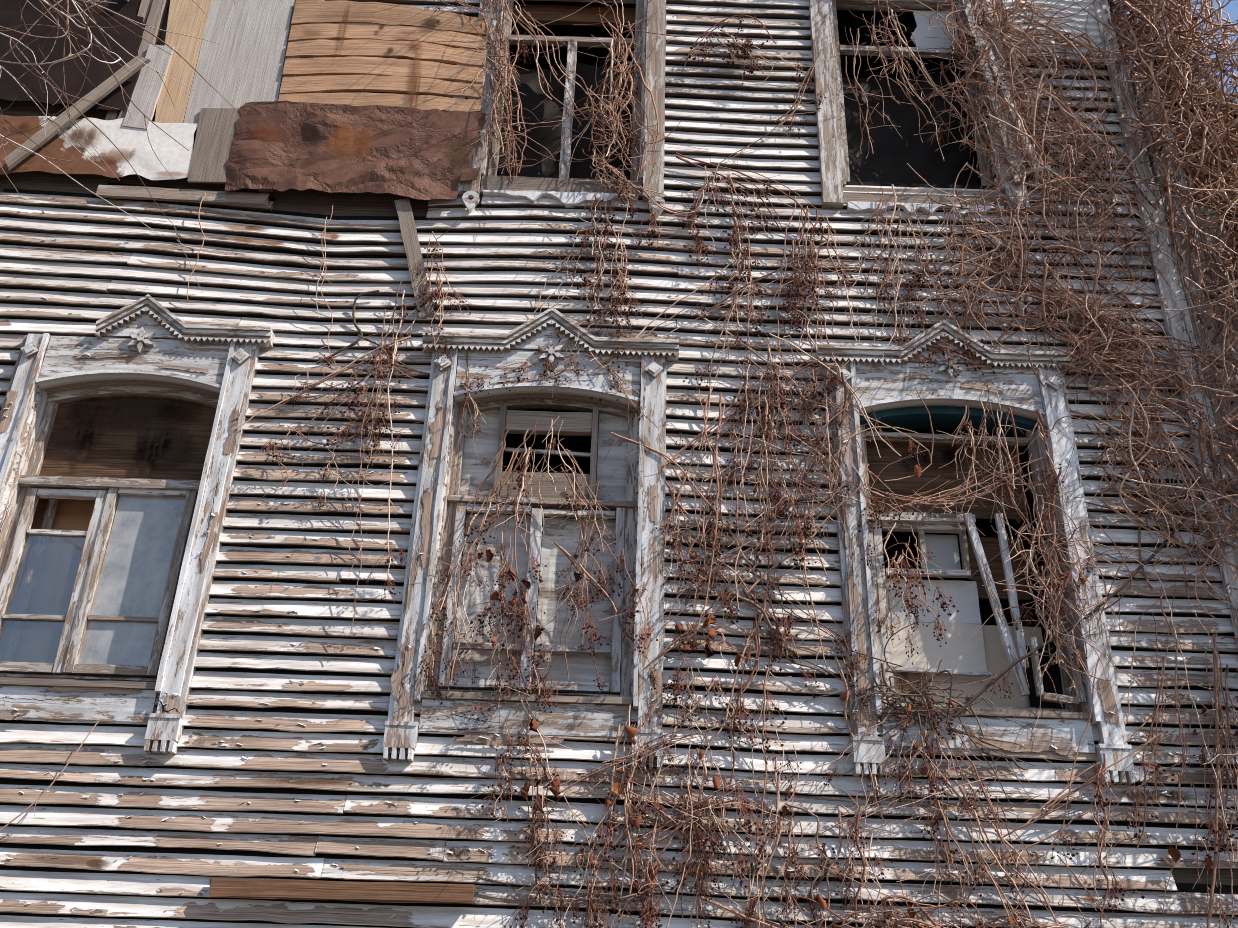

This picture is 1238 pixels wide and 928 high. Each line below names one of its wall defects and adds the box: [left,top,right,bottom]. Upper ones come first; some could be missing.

corrosion [72,128,98,146]
corrosion [100,150,134,160]
peeling [0,280,90,326]
peeling [0,390,18,433]
damp [56,395,199,475]
peeling [841,435,852,476]
peeling [420,489,435,569]
peeling [674,570,828,599]
peeling [675,623,834,655]
peeling [737,652,874,732]
peeling [1055,617,1238,844]
peeling [0,678,1238,928]